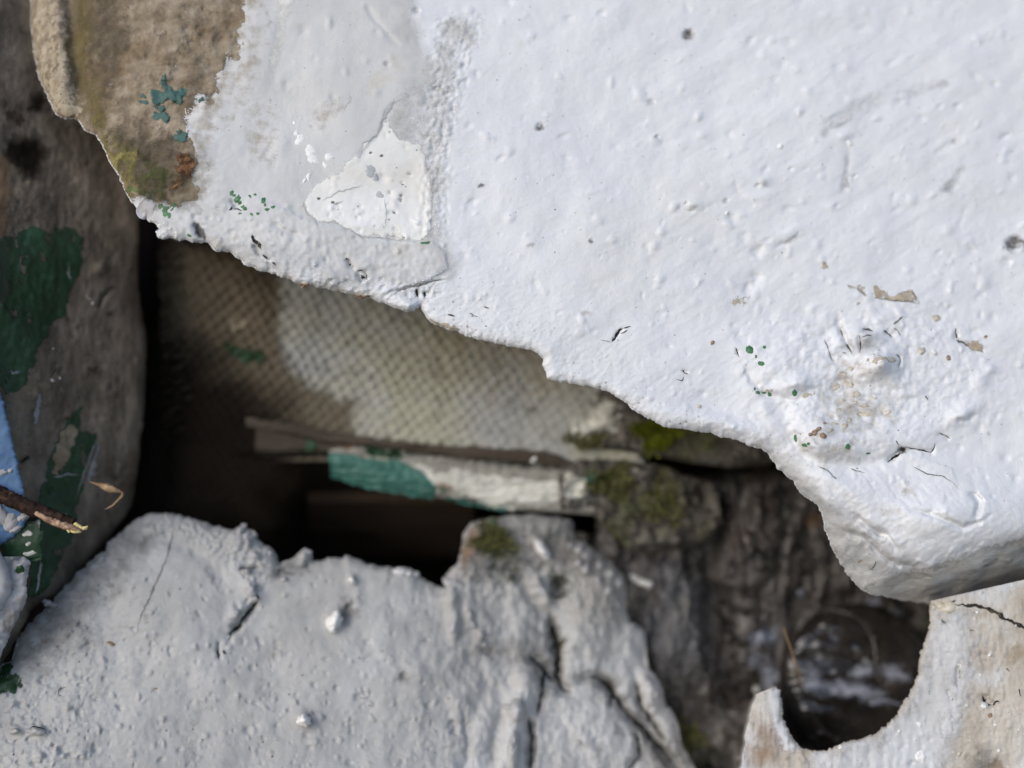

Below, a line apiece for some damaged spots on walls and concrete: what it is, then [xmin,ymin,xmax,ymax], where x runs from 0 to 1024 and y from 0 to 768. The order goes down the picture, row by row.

peeling [31,0,246,220]
peeling [293,98,433,244]
peeling [0,504,29,533]
crack [951,600,1024,631]
crack [528,614,676,768]